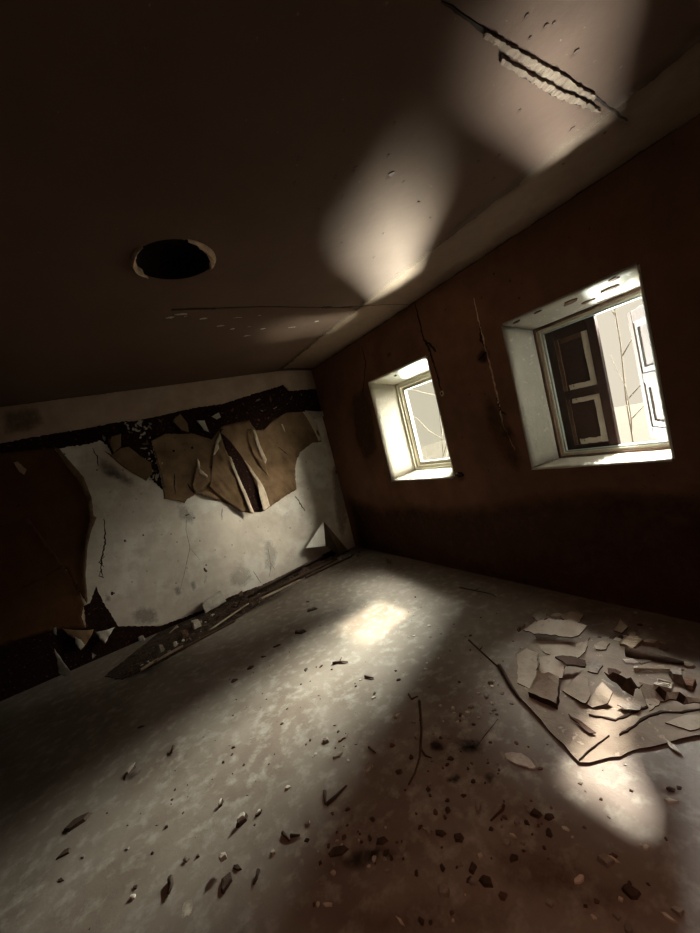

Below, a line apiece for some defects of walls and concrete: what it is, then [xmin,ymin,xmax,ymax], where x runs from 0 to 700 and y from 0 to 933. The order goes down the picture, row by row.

crack [441,0,628,122]
crack [171,304,442,391]
crack [474,299,515,450]
flaking render [0,385,321,490]
flaking render [0,587,205,701]